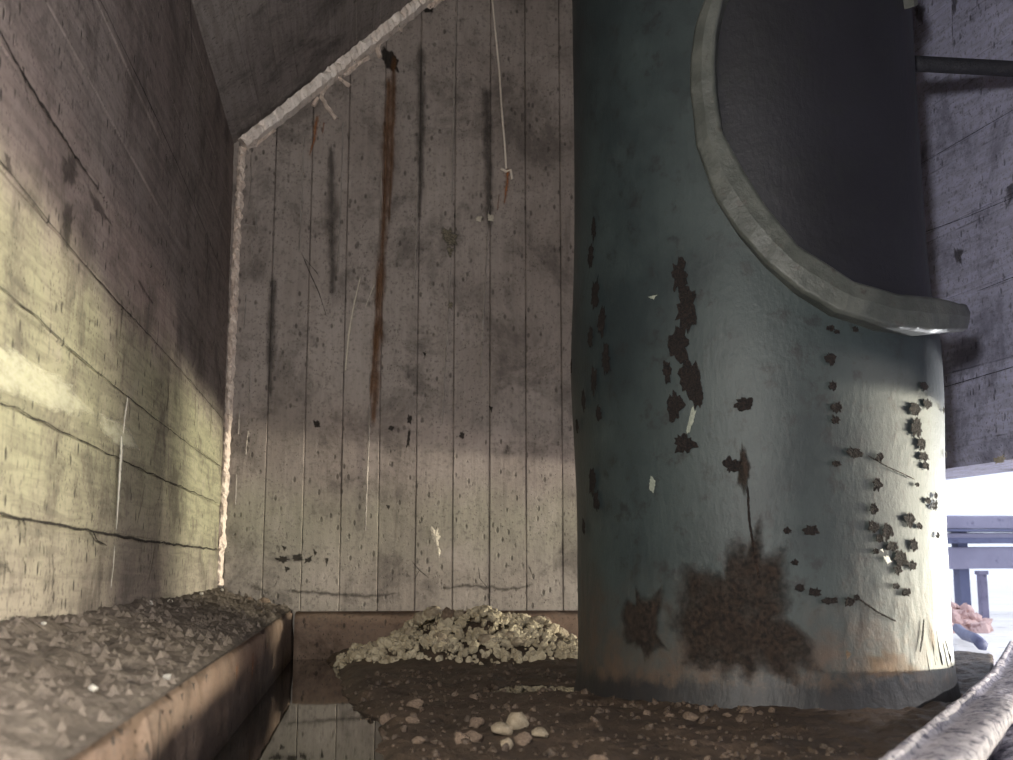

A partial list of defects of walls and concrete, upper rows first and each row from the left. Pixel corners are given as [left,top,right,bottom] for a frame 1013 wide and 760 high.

peeling [662,257,703,453]
peeling [734,397,753,411]
peeling [830,402,842,424]
peeling [909,382,945,470]
peeling [722,455,740,472]
peeling [832,446,864,467]
peeling [924,492,938,510]
peeling [783,525,820,535]
peeling [868,477,923,596]
peeling [794,584,860,607]